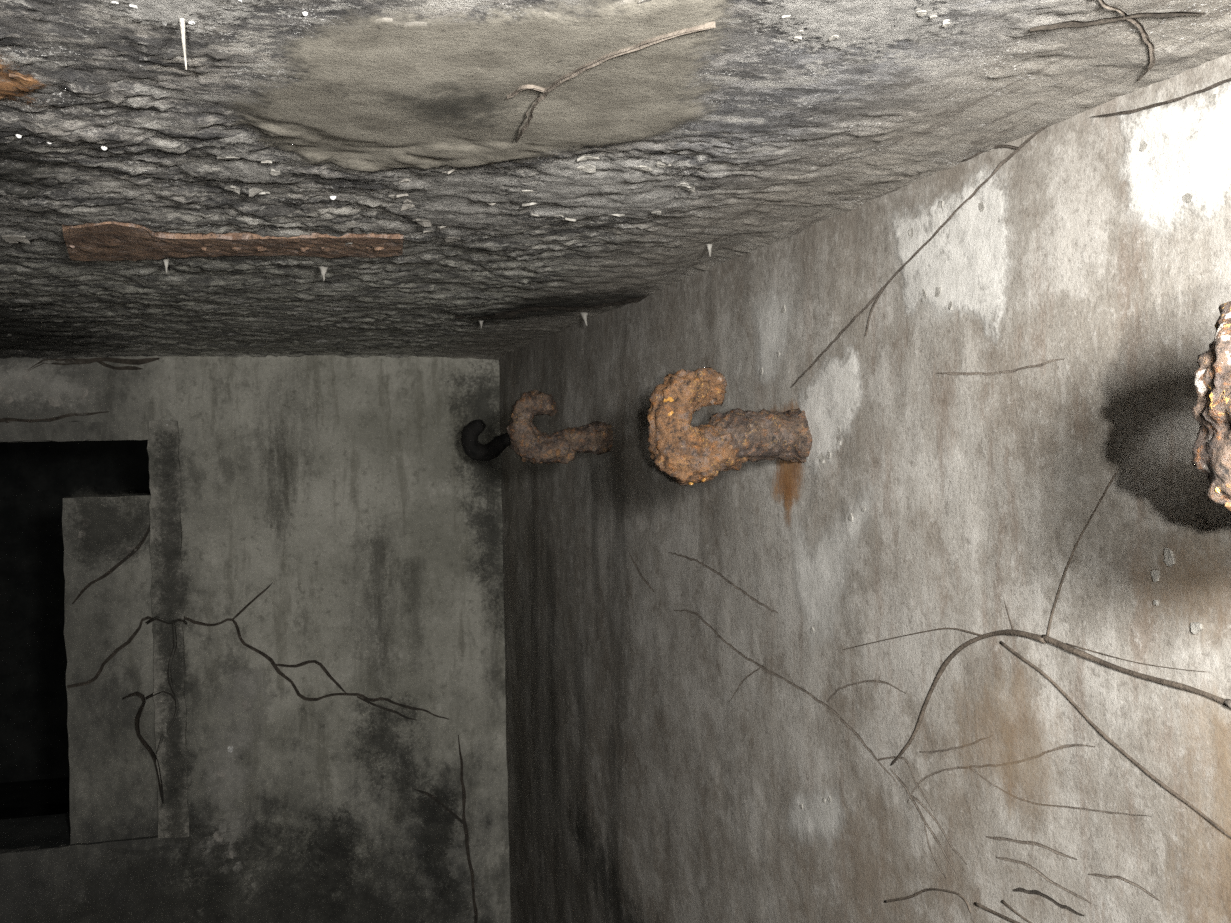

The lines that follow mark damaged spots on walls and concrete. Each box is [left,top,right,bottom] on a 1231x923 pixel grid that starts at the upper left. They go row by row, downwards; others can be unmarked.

corrosion [0,59,44,101]
corrosion [63,222,404,261]
crack [791,121,1062,387]
corrosion [775,460,801,513]
crack [67,583,478,923]